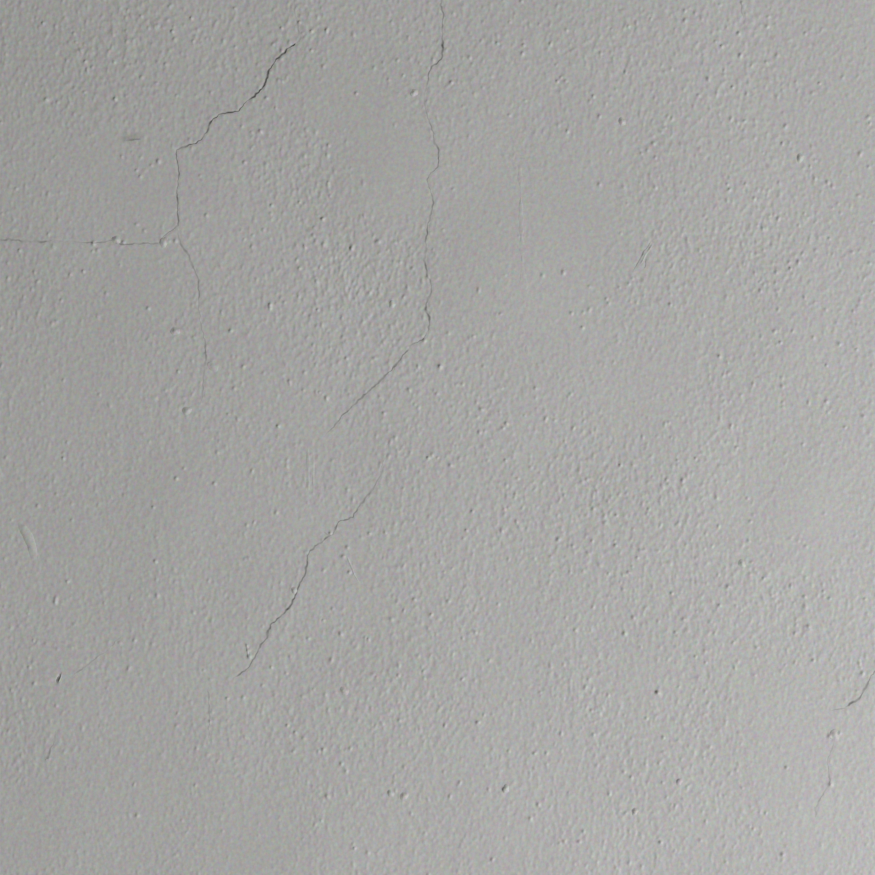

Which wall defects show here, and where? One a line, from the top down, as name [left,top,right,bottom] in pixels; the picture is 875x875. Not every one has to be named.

crack [0,0,302,405]
crack [324,0,445,438]
crack [233,444,388,679]